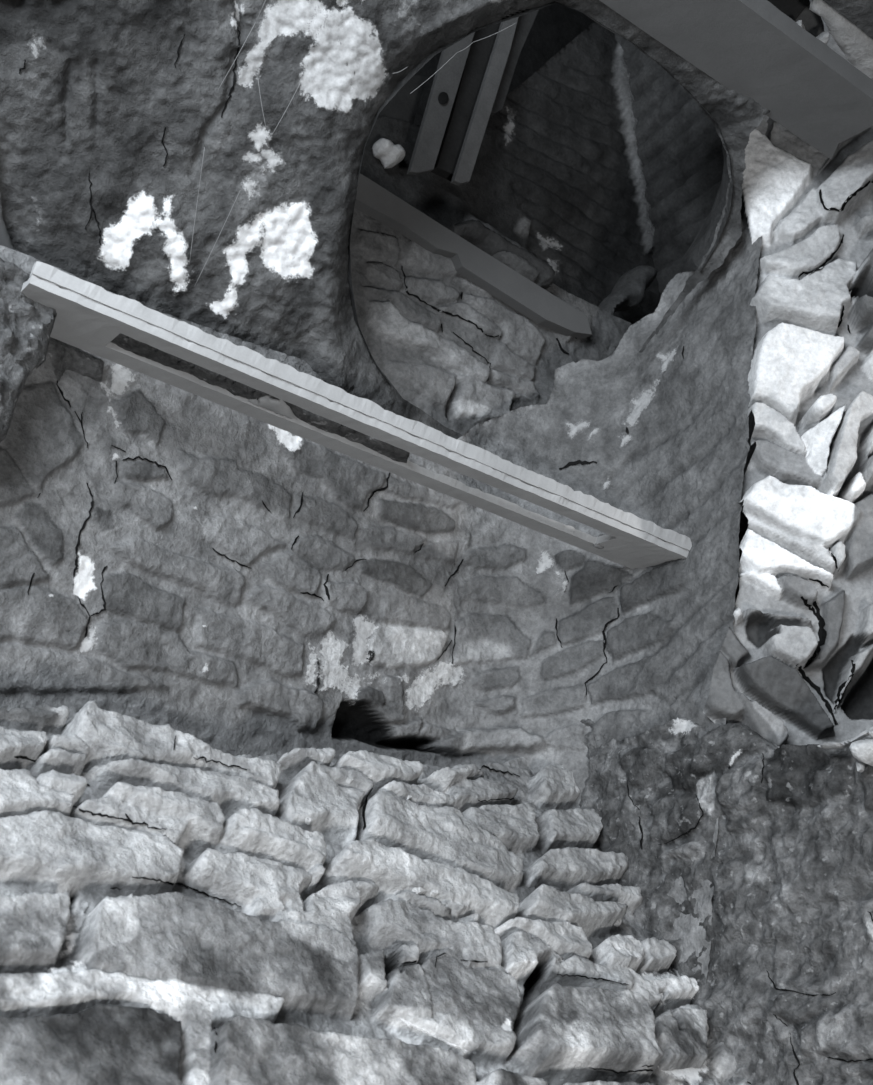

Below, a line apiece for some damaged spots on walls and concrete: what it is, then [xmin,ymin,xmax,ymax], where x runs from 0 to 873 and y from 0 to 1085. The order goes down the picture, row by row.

crack [56,381,172,638]
crack [364,473,390,511]
damp [73,552,97,601]
damp [305,614,380,705]
damp [396,661,467,712]
crack [767,971,836,1085]
crack [827,1055,873,1063]